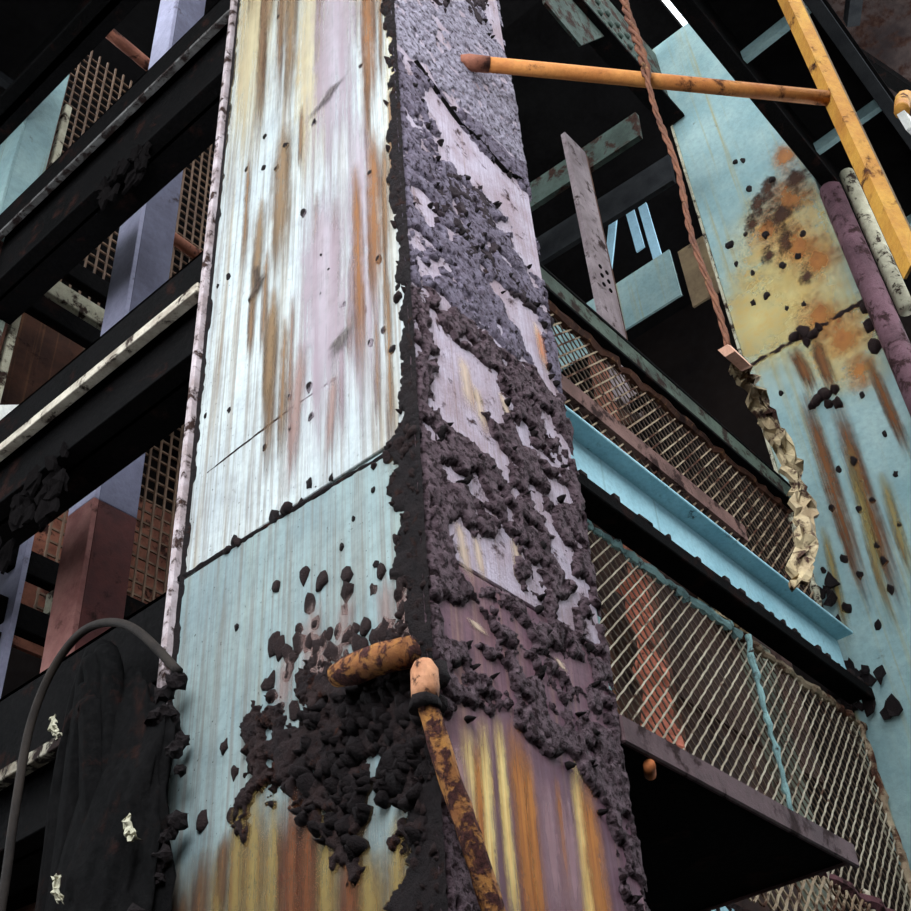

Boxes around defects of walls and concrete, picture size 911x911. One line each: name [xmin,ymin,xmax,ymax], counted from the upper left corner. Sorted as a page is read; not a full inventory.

spalling [466,0,505,53]
corrosion [172,0,241,662]
corrosion [241,110,304,470]
spalling [269,477,312,524]
corrosion [337,0,434,661]
peeling [370,425,422,470]
spalling [427,172,554,330]
peeling [535,593,547,614]
peeling [546,363,561,387]
corrosion [730,147,906,443]
corrosion [807,406,911,605]
corrosion [172,625,448,911]